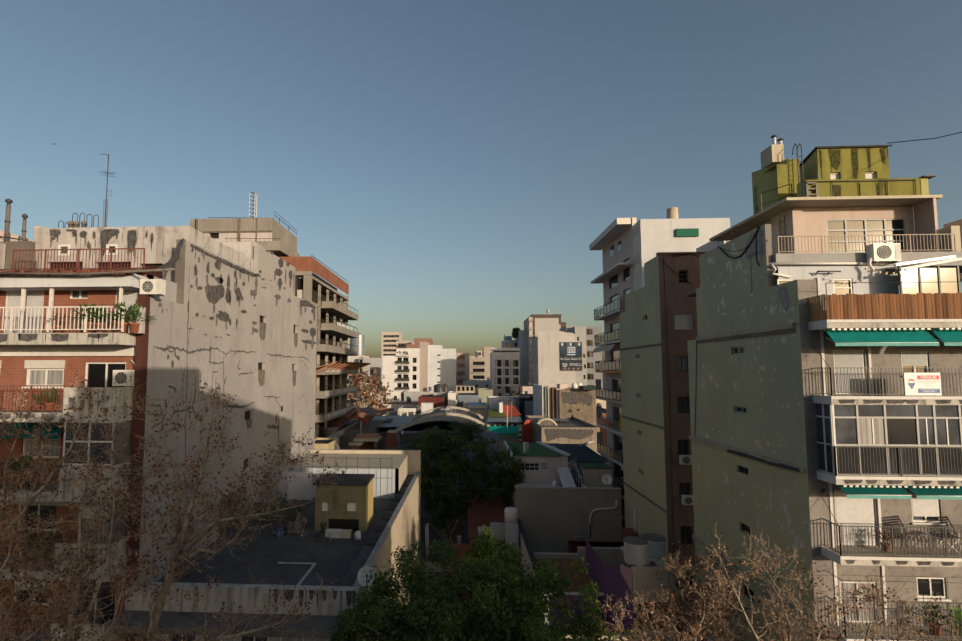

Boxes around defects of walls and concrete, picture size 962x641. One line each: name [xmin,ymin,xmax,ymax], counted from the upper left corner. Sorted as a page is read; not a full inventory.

leakage [50,229,163,263]
leakage [190,244,316,350]
peeling [699,234,800,411]
crack [151,303,309,472]
leakage [269,589,355,609]